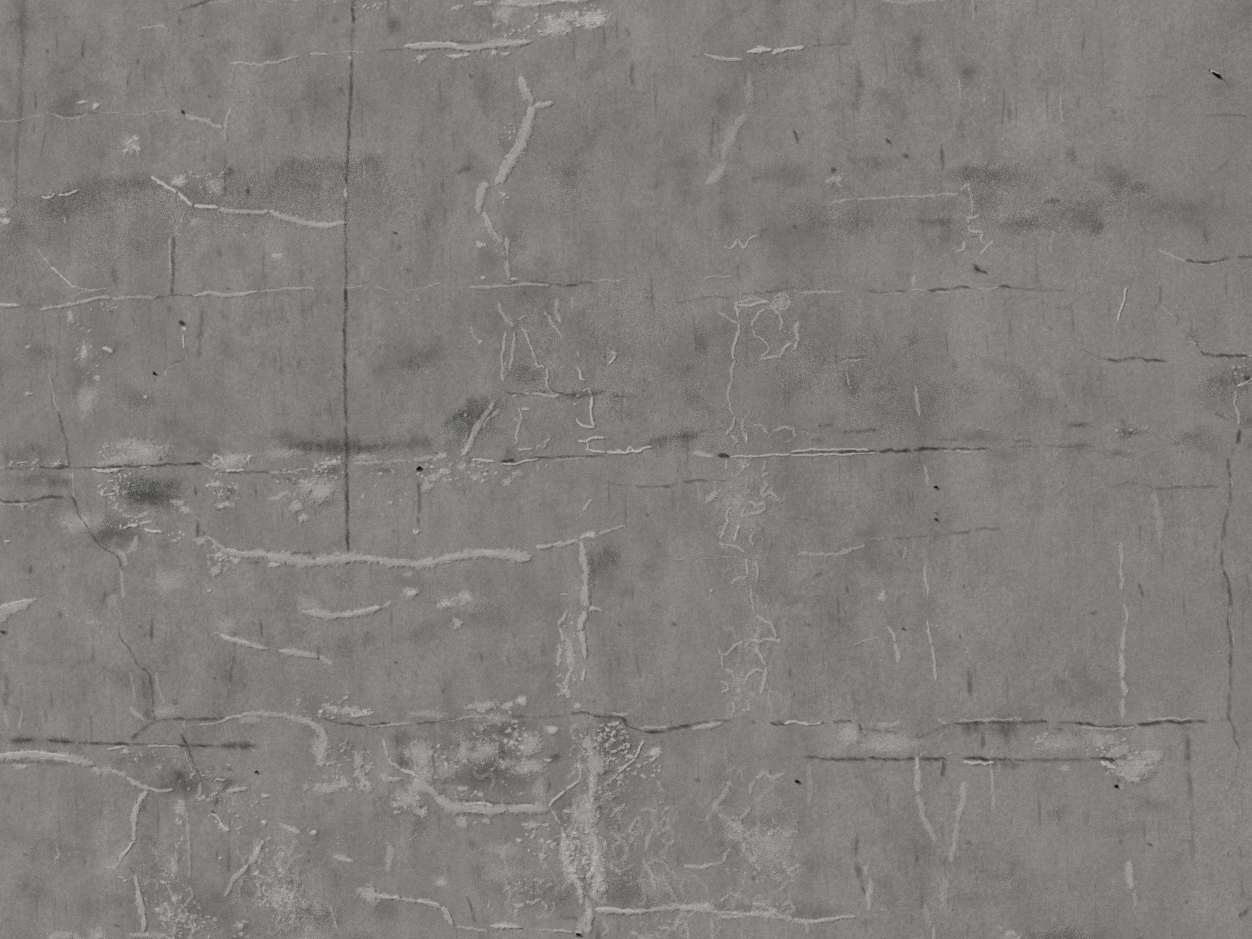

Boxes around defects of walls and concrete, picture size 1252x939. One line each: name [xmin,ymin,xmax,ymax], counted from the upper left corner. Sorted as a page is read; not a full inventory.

crack [311,53,352,181]
crack [341,287,349,373]
crack [6,462,262,515]
crack [472,447,651,465]
crack [695,452,728,480]
crack [838,446,990,454]
crack [574,711,721,733]
crack [771,716,1228,776]